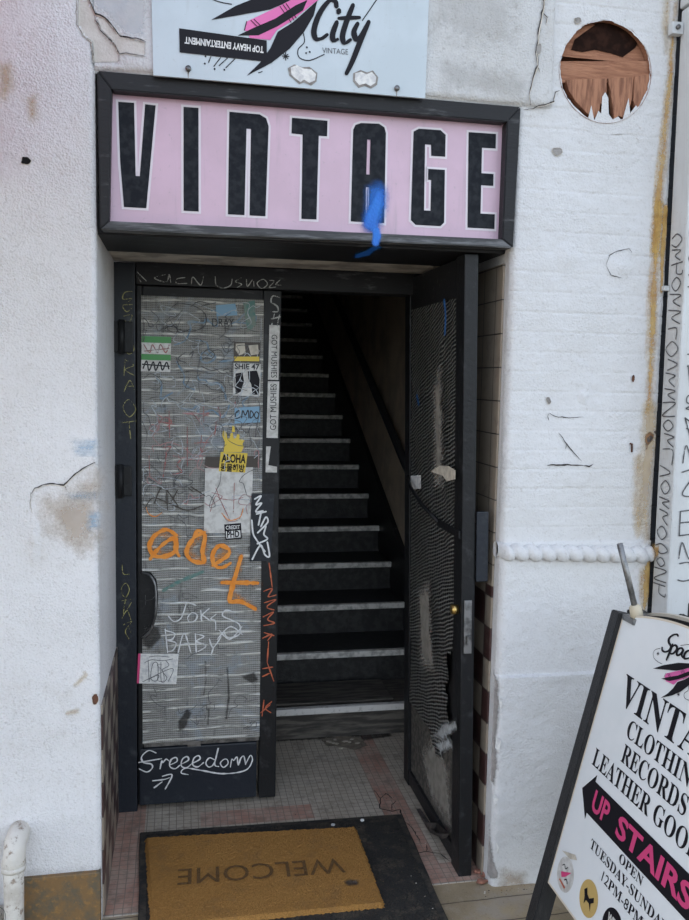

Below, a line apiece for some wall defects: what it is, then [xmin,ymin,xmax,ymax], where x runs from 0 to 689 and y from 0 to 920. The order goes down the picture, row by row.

crack [76,0,146,61]
flaking render [78,0,145,62]
crack [524,0,560,111]
corrosion [641,547,659,608]